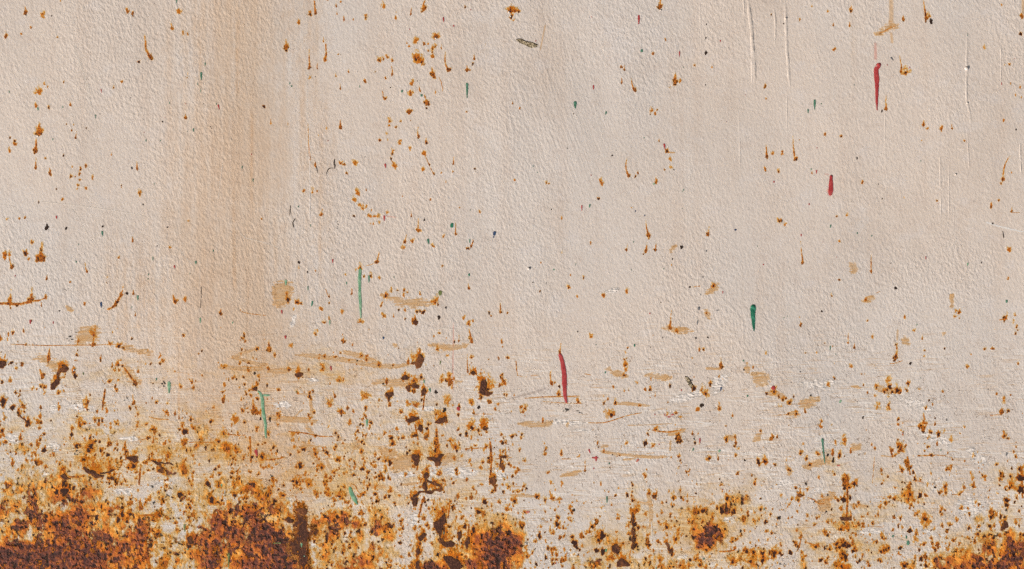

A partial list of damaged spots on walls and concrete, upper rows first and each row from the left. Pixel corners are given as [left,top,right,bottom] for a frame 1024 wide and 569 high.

corrosion [406,33,451,109]
corrosion [388,110,435,175]
corrosion [0,320,1024,569]